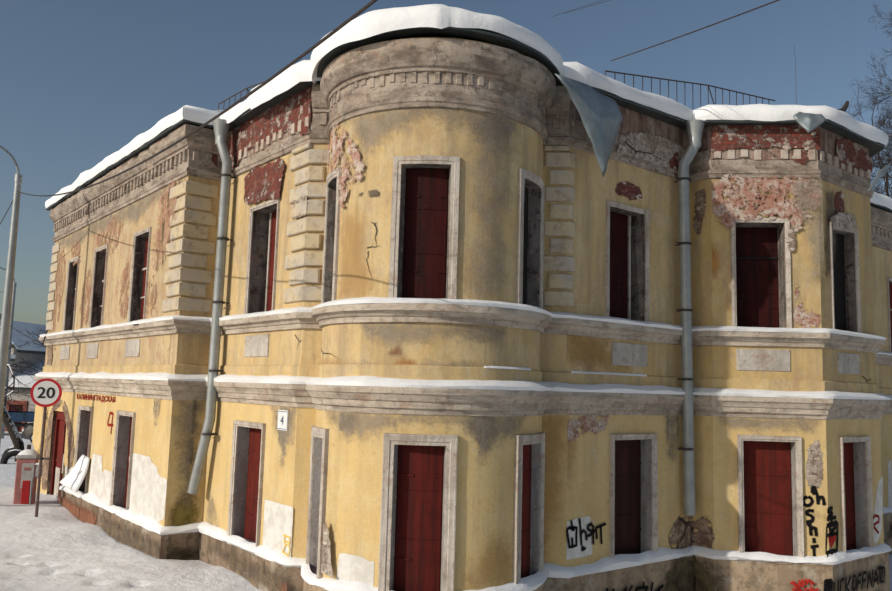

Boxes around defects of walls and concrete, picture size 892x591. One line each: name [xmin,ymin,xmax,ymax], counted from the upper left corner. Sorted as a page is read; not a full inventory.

flaking render [211,86,312,169]
flaking render [244,157,285,206]
flaking render [327,123,364,208]
flaking render [615,181,642,200]
flaking render [617,132,687,176]
flaking render [693,174,822,252]
flaking render [711,125,821,164]
flaking render [831,190,858,232]
flaking render [836,138,873,172]
flaking render [806,440,824,492]